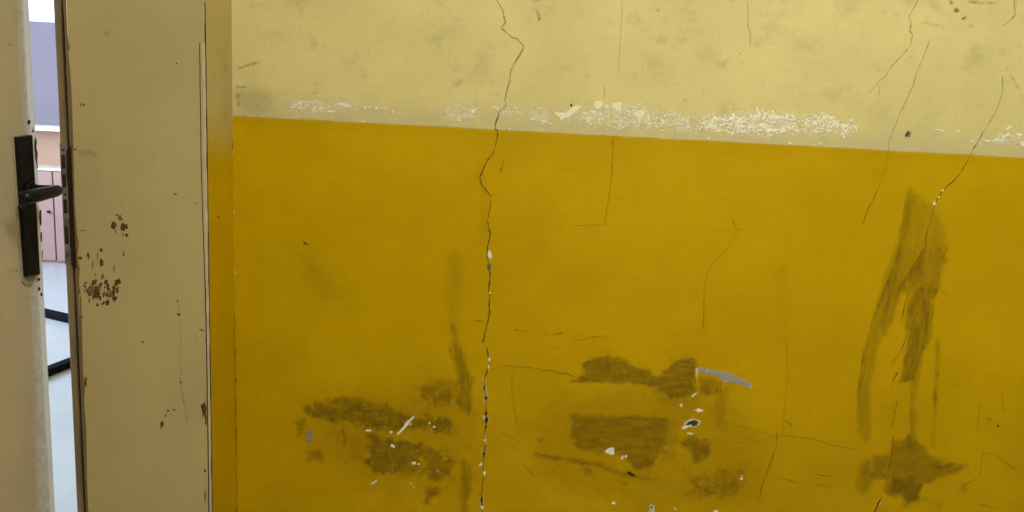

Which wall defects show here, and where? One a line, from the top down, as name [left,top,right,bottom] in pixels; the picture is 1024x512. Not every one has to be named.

crack [469,0,576,512]
crack [862,0,931,224]
crack [873,76,1003,512]